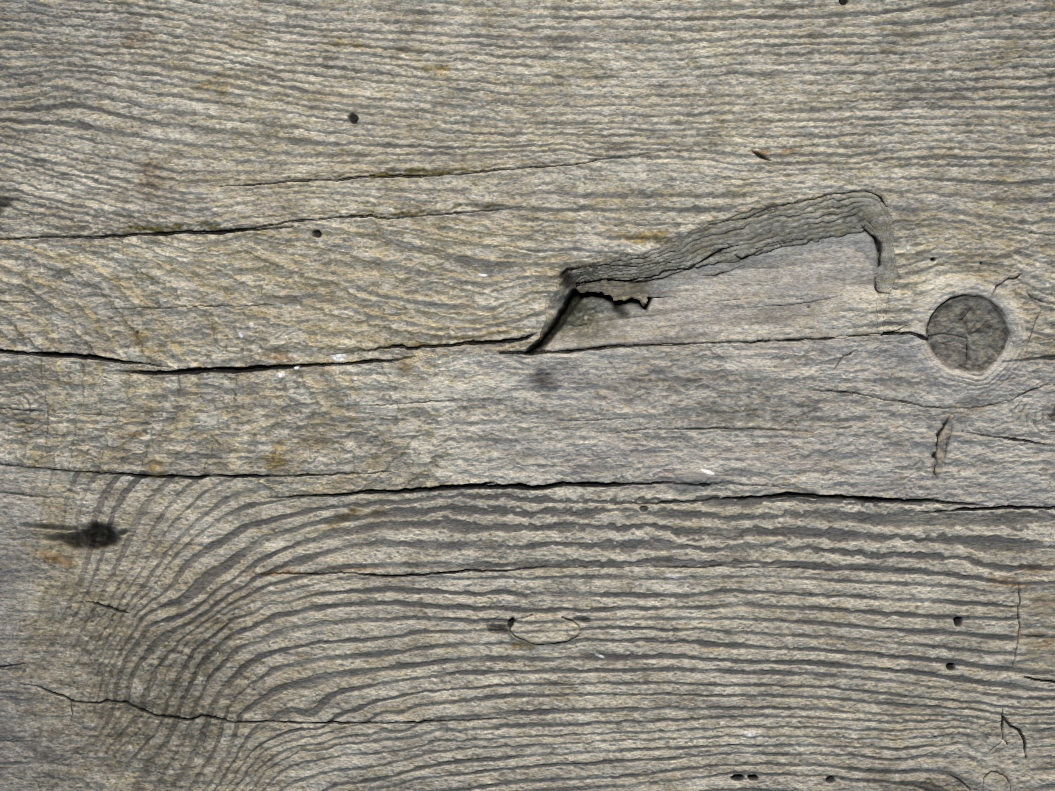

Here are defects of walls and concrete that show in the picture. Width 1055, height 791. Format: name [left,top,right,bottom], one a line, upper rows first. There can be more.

crack [0,275,1036,375]
spalling [530,290,649,352]
crack [675,424,776,432]
crack [0,463,1055,513]
crack [42,687,483,724]